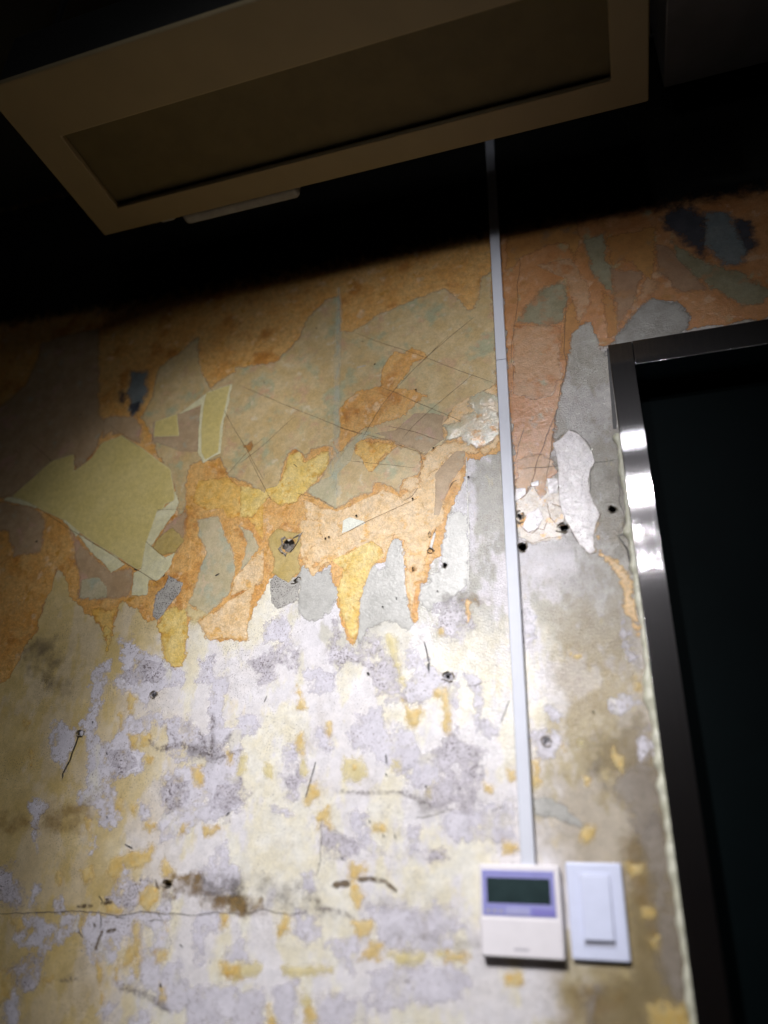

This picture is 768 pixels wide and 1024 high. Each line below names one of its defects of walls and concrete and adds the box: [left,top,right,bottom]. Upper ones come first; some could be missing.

damp [664,207,758,265]
peeling [511,325,563,400]
flaking render [119,371,148,415]
flaking render [153,575,183,620]
flaking render [192,435,519,844]
flaking render [49,607,261,856]
flaking render [27,798,49,847]
flaking render [318,807,385,860]
damp [162,861,201,898]
crack [9,909,304,921]
damp [213,896,263,926]
flaking render [0,864,300,1024]